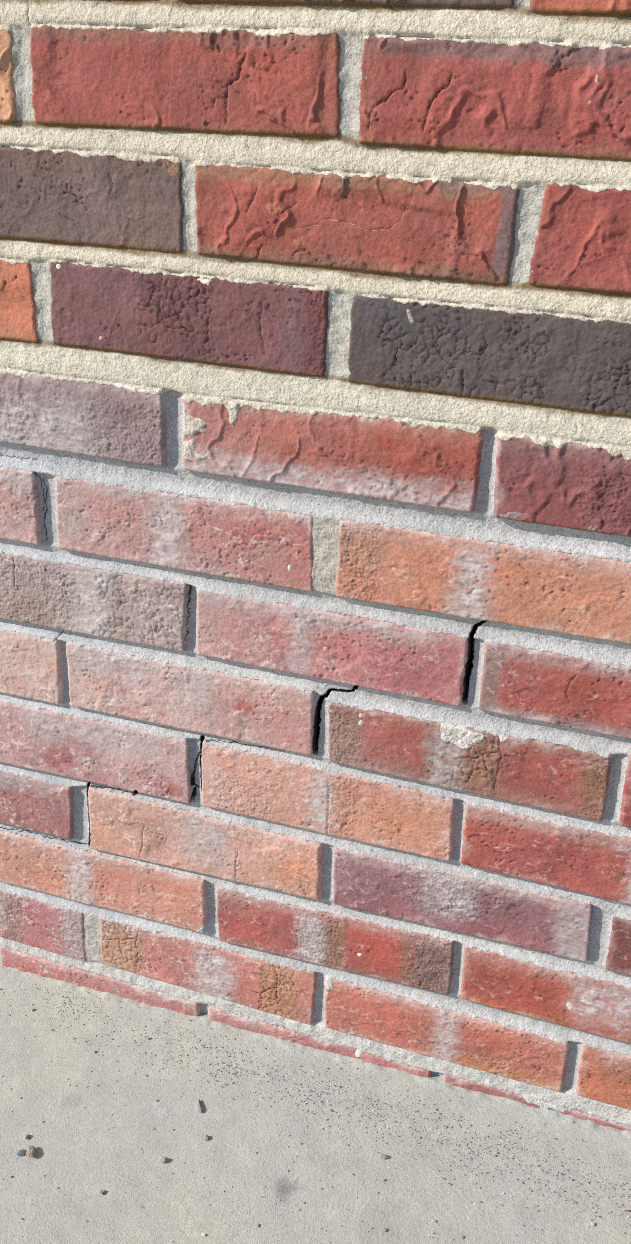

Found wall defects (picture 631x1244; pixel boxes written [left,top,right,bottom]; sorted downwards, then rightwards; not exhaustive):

crack [184,585,192,650]
crack [463,620,488,703]
crack [190,685,358,825]
crack [0,782,138,845]